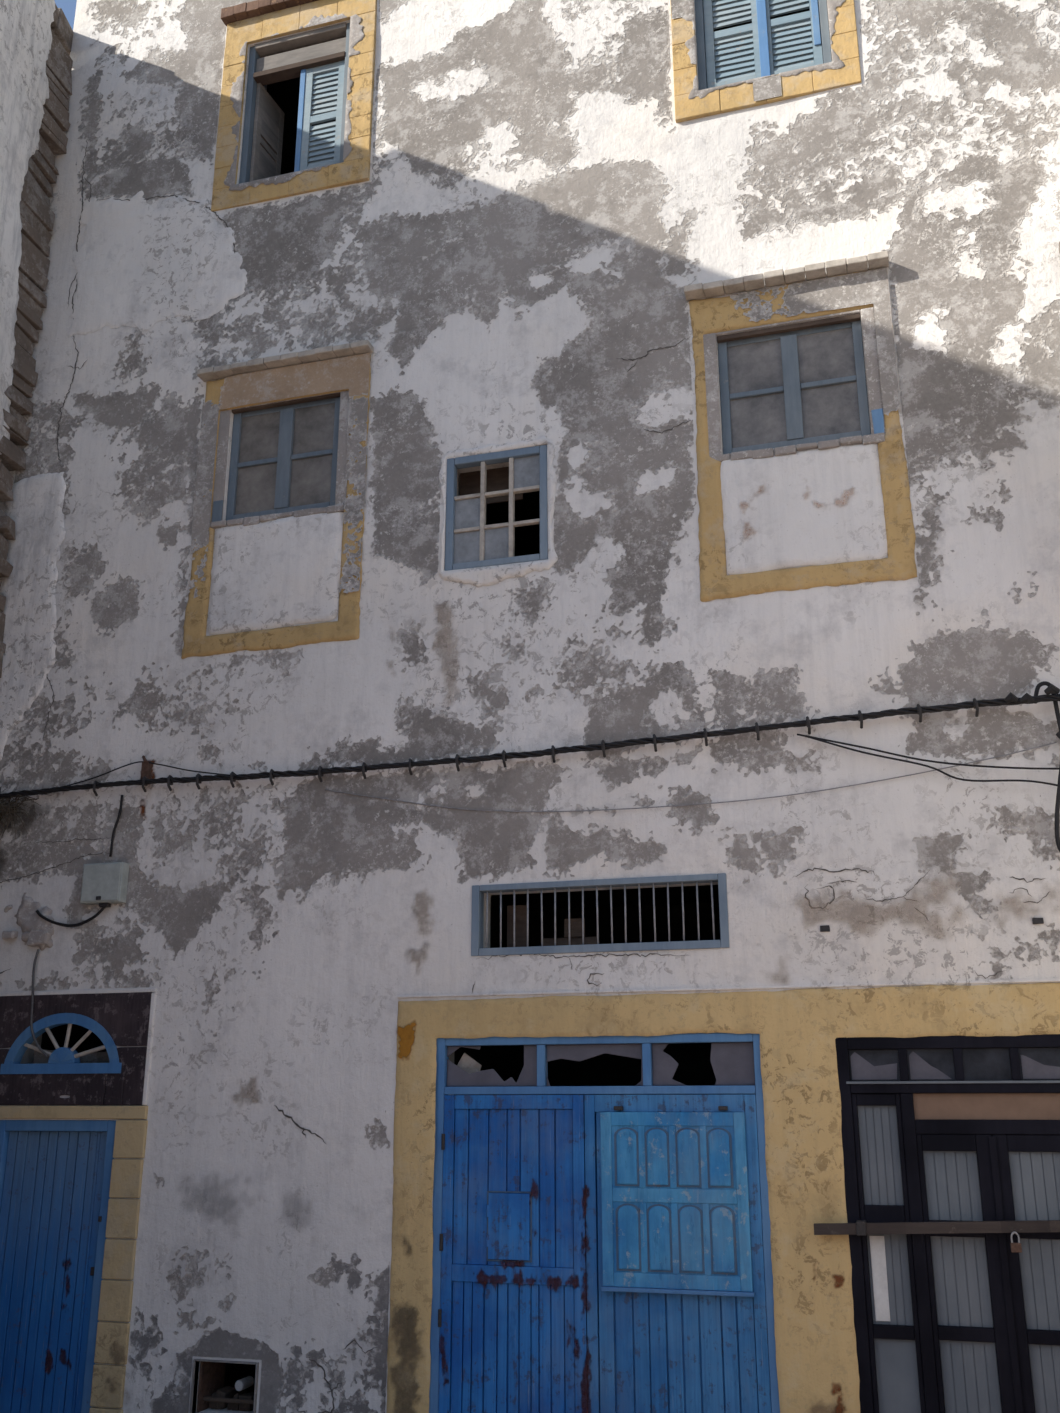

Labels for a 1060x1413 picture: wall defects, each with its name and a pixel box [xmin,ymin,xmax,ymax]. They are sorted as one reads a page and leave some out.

crack [57,140,249,468]
peeling [730,0,1060,768]
peeling [0,0,825,1015]
crack [43,677,54,737]
peeling [910,795,1060,979]
crack [274,1105,326,1144]
peeling [364,1110,390,1150]
corrosion [45,1348,71,1374]
spalling [128,1233,390,1413]
damp [392,1308,419,1413]